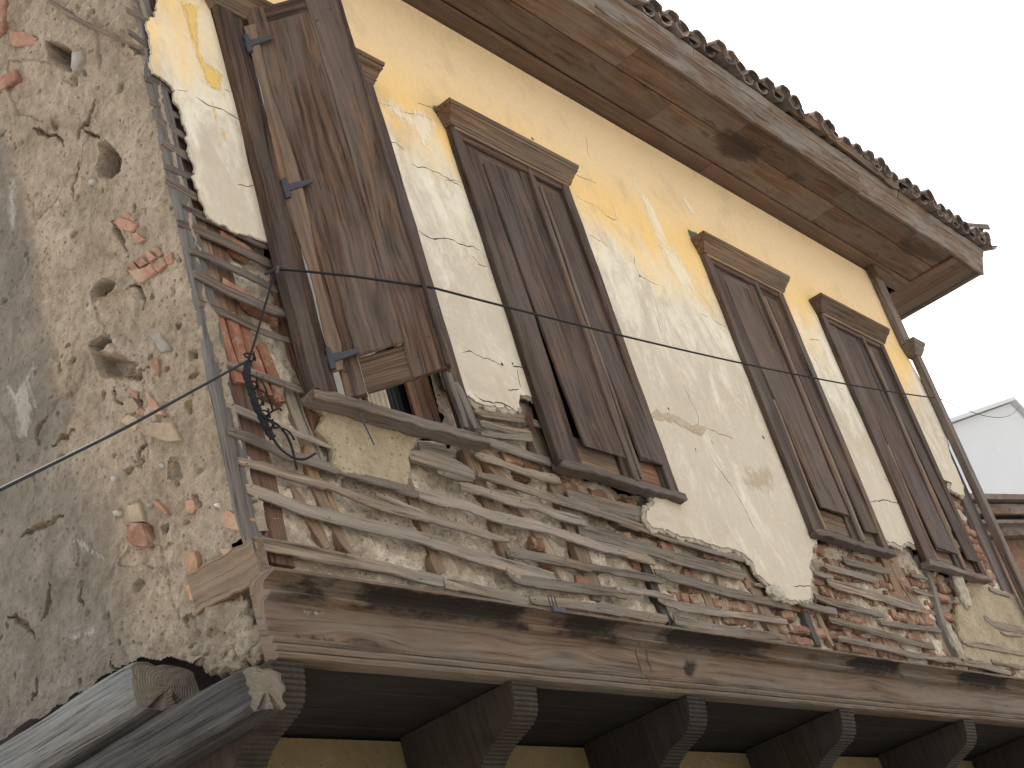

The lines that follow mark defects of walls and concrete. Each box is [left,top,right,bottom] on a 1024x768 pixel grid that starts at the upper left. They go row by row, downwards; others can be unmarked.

crack [418,230,487,267]
crack [462,350,522,409]
crack [651,382,756,531]